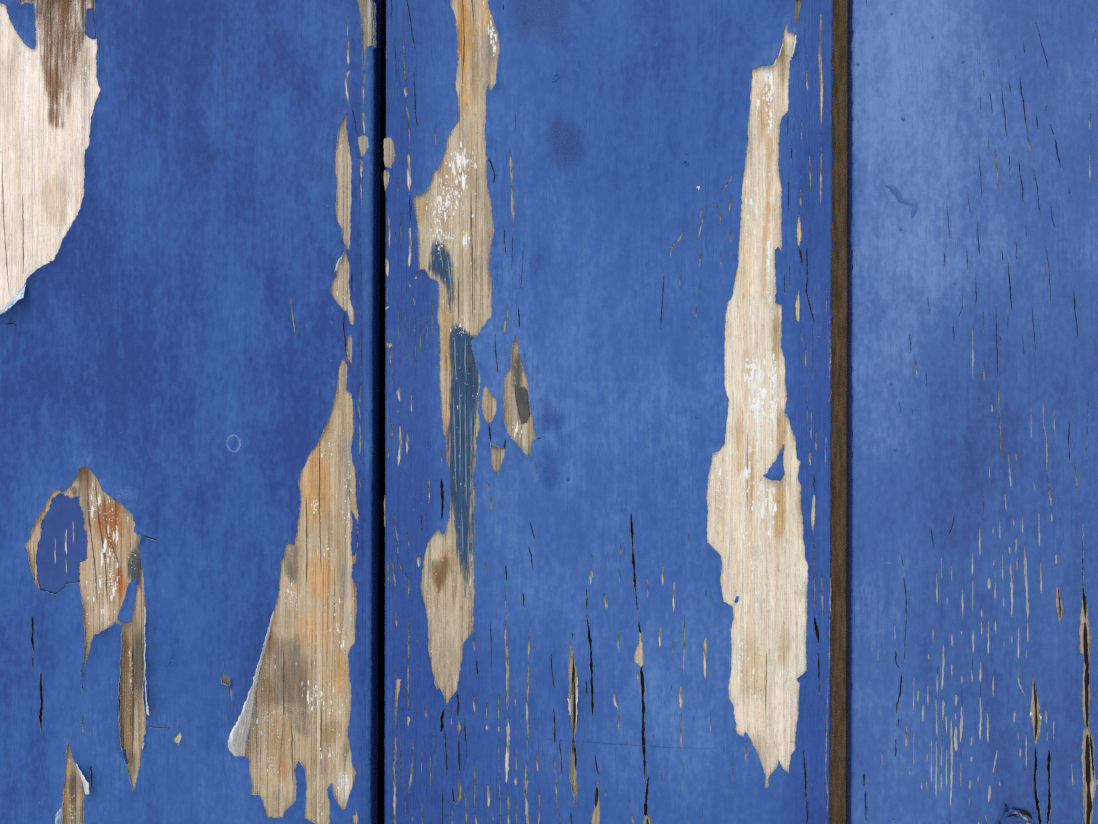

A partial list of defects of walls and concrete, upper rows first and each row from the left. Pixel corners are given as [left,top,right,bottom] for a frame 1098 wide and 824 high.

peeling [0,0,101,314]
leakage [20,0,95,127]
peeling [55,742,89,824]
peeling [26,466,150,792]
peeling [221,113,368,824]
peeling [358,0,377,67]
peeling [414,0,537,705]
crack [343,0,747,824]
peeling [707,0,815,788]
crack [863,28,1091,824]